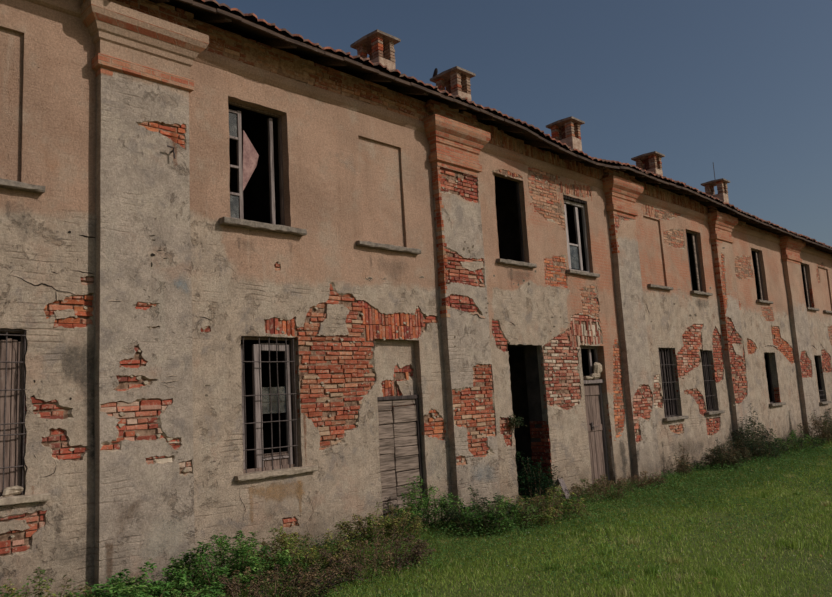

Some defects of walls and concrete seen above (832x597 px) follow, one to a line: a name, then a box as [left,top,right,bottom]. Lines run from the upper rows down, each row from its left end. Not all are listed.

spalling [136,121,187,150]
crack [8,269,95,301]
spalling [25,395,90,461]
spalling [44,276,94,329]
spalling [99,344,193,476]
spalling [264,282,439,451]
spalling [422,364,512,466]
spalling [444,241,510,353]
spalling [539,284,603,410]
spalling [607,339,663,444]
spalling [673,247,757,438]
spalling [0,510,47,557]